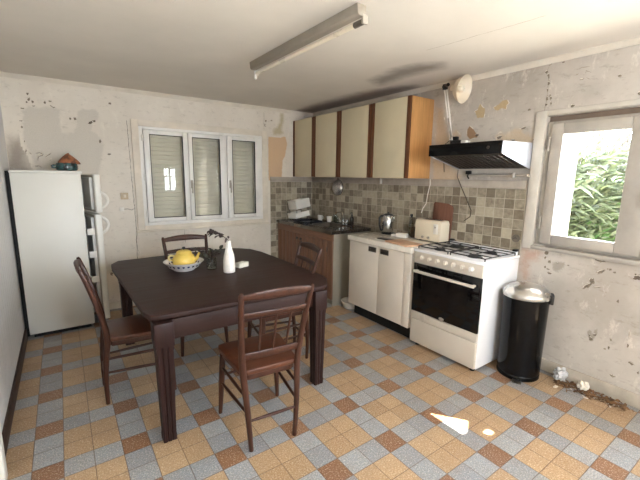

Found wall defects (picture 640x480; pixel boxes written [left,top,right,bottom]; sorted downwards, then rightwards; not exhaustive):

peeling [17,92,111,178]
peeling [267,135,288,182]
peeling [432,98,510,145]
spalling [582,259,616,289]